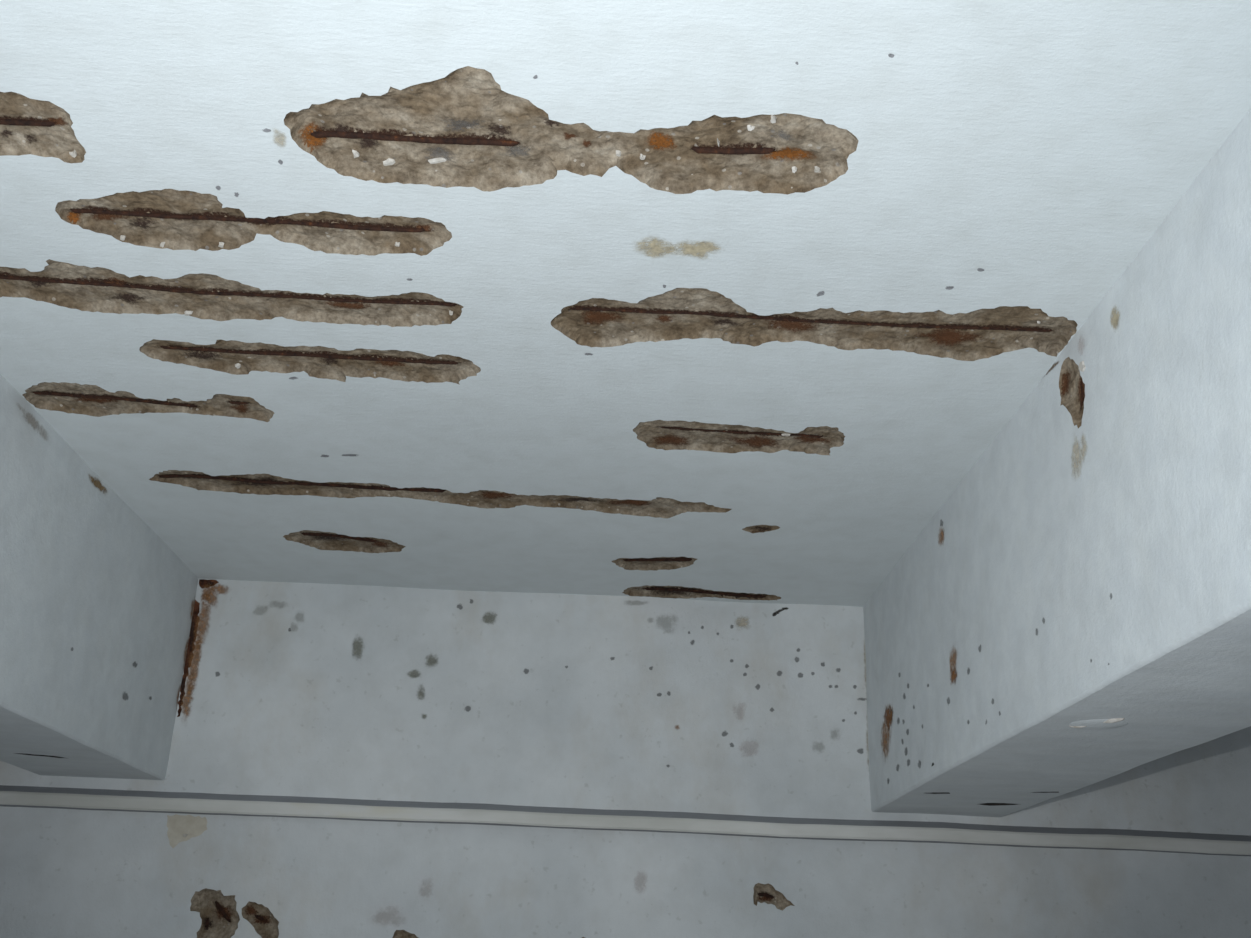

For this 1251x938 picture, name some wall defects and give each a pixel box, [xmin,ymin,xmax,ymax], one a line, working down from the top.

spalling [0,92,86,163]
spalling [284,66,858,195]
spalling [55,189,452,256]
spalling [0,259,463,327]
spalling [139,339,481,385]
spalling [551,288,1086,428]
spalling [23,382,274,422]
spalling [633,420,845,455]
spalling [149,470,731,518]
spalling [283,530,406,553]
rust [882,706,893,754]
spalling [190,888,279,938]